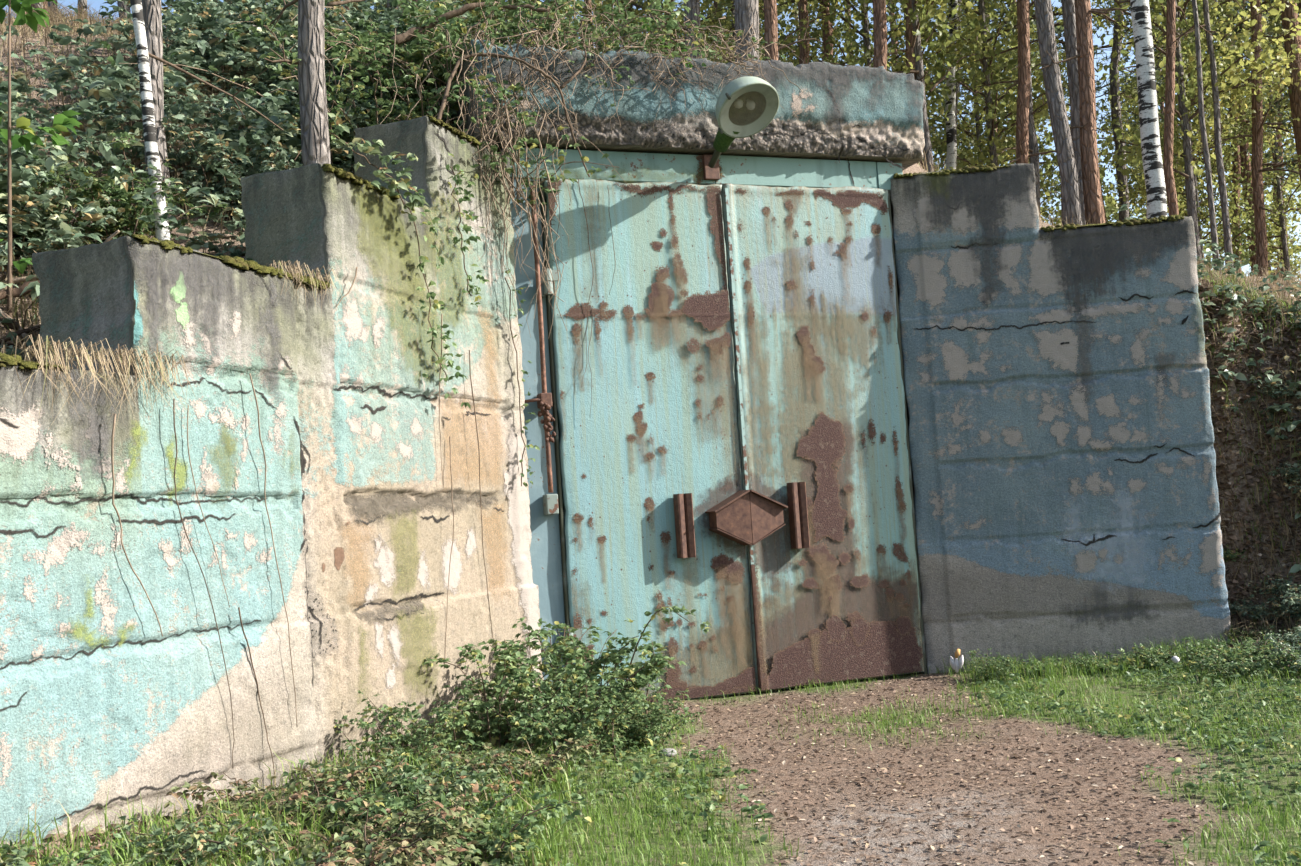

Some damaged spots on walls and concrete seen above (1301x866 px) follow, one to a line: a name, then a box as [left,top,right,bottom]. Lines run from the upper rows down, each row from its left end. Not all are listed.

spalling [486,74,921,159]
leakage [1044,217,1195,401]
peeling [0,400,83,503]
peeling [23,522,143,664]
crack [0,620,261,711]
crack [0,494,268,538]
crack [167,377,323,686]
crack [355,592,444,621]
crack [421,515,449,523]
peeling [344,427,541,689]
rust [560,154,923,703]
peeling [905,189,1224,588]